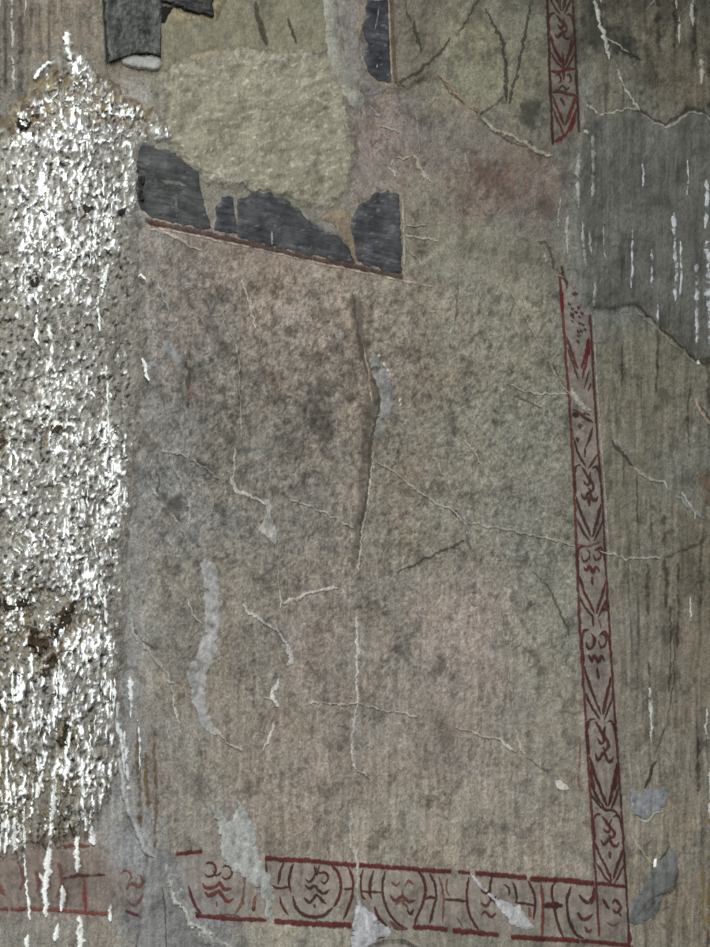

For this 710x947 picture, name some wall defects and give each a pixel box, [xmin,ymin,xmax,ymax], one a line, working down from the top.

crack [397,0,552,157]
crack [584,0,710,134]
damp [671,213,683,301]
damp [694,241,710,342]
damp [0,0,172,919]
crack [291,293,574,577]
crack [130,547,338,800]
crack [310,617,418,902]
damp [76,916,86,947]
spalling [165,864,232,947]
peeling [211,800,276,921]
peeling [350,895,392,947]